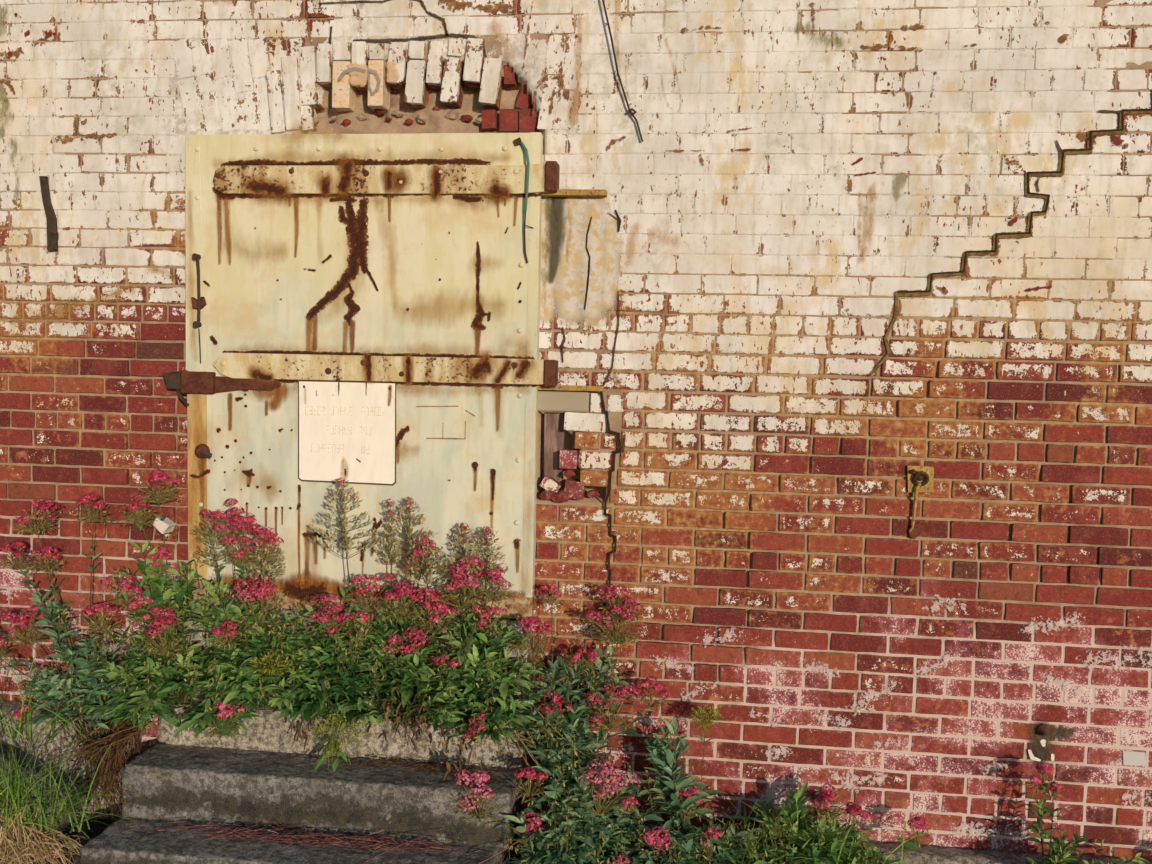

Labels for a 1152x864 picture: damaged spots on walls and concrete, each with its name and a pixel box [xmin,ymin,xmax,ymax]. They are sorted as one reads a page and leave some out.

crack [290,0,487,57]
flaking render [373,109,414,125]
crack [869,93,1152,376]
corrosion [190,155,542,603]
efflorescence [696,625,746,648]
efflorescence [1018,612,1085,639]
efflorescence [650,652,720,702]
efflorescence [1041,645,1152,697]
efflorescence [813,678,903,731]
water stain [1028,739,1055,761]
efflorescence [826,770,890,794]
efflorescence [951,820,1033,843]